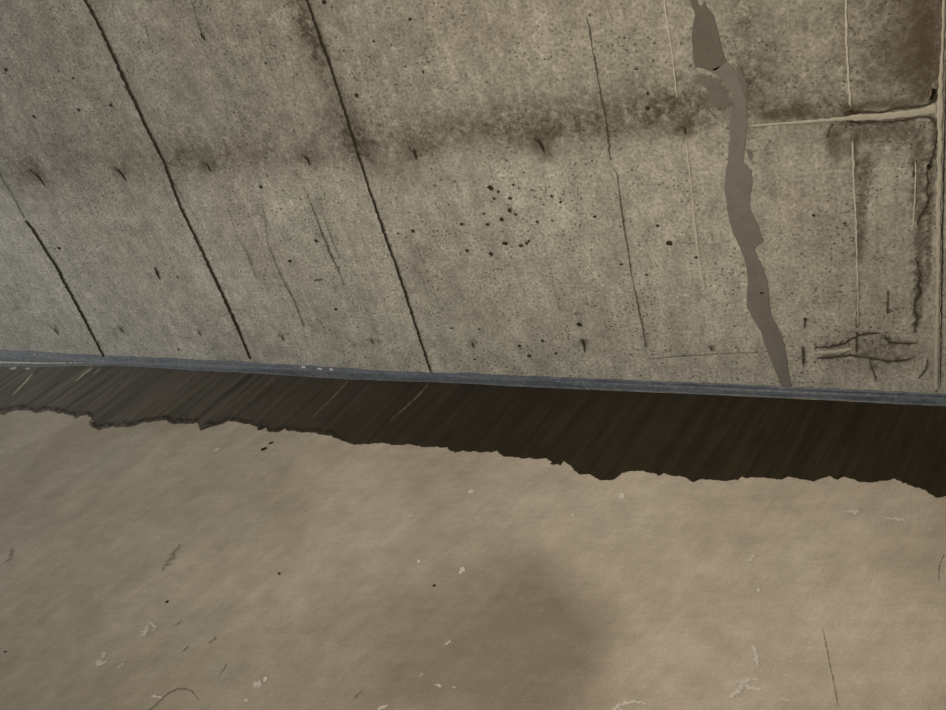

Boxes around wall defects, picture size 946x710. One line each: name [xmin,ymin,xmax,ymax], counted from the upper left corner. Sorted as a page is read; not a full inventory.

damp [845,0,938,226]
damp [816,141,922,382]